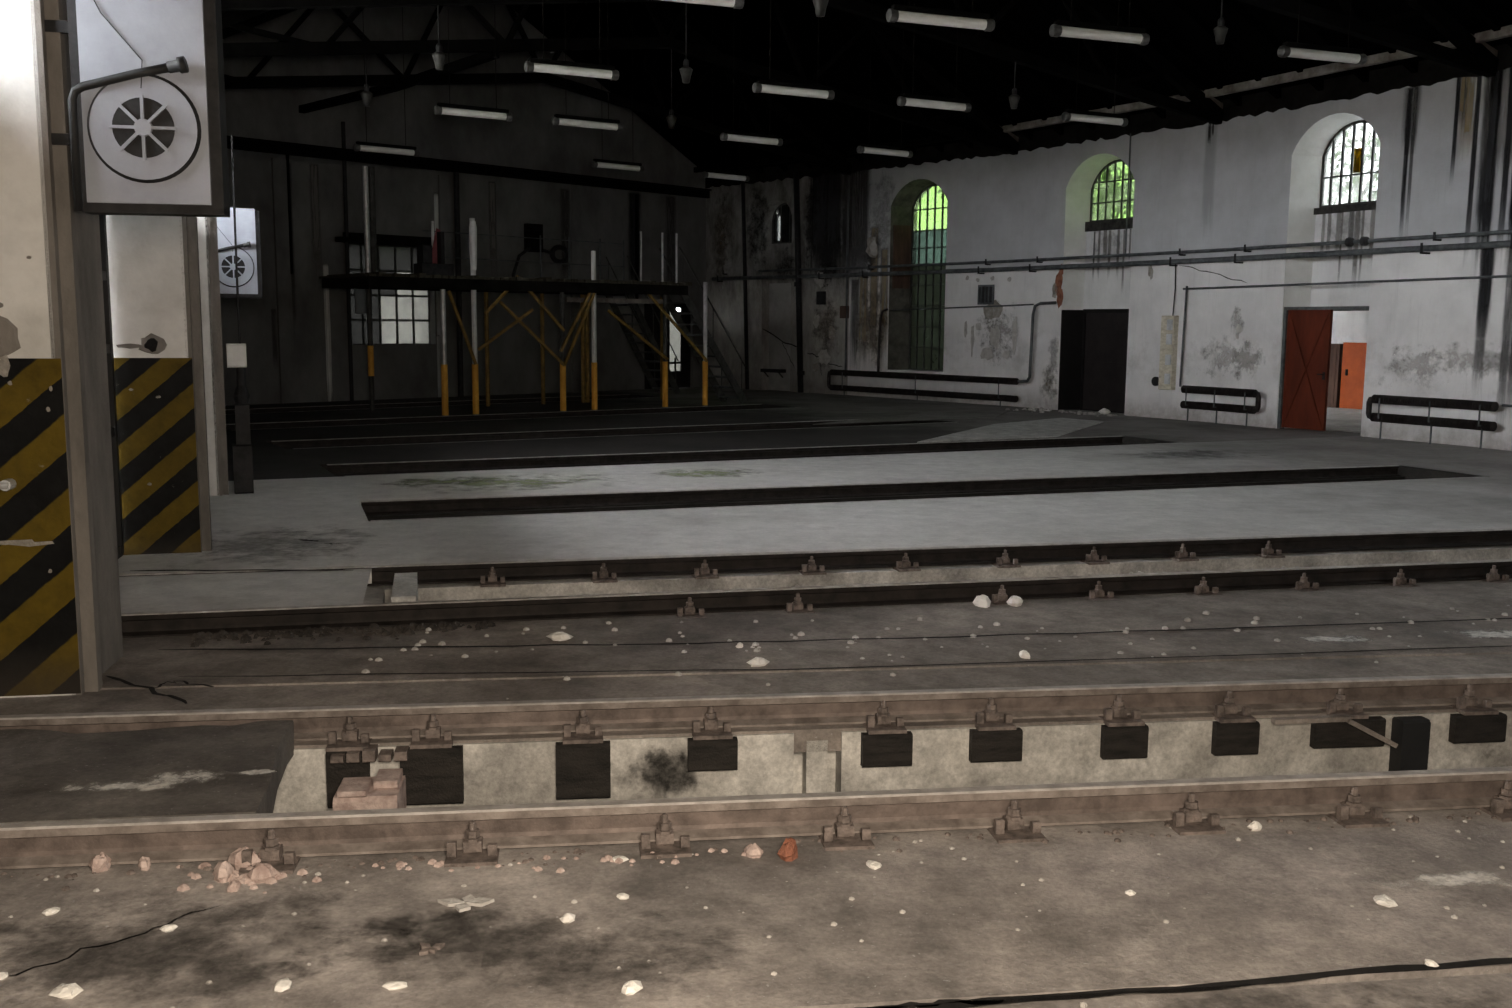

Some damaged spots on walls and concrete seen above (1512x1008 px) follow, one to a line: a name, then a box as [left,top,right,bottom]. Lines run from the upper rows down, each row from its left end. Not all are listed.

leakage [747,170,888,366]
flaking render [964,300,1017,360]
leakage [1321,210,1376,271]
leakage [1395,67,1512,396]